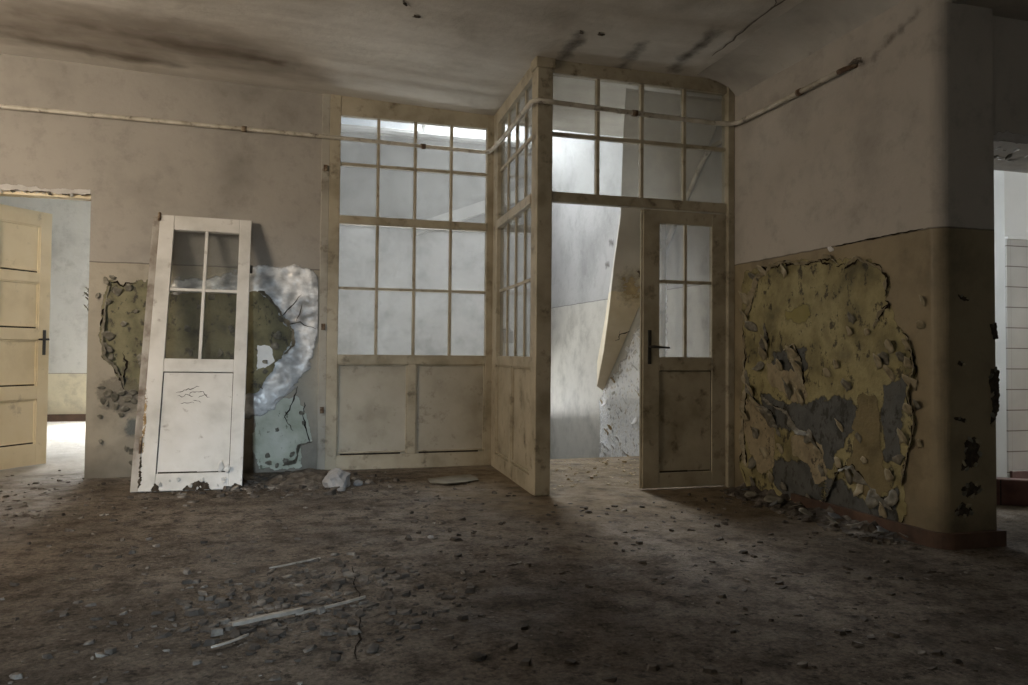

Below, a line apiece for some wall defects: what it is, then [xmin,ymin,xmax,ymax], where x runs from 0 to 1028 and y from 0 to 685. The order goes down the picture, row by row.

peeling [84,275,148,419]
peeling [252,396,312,470]
peeling [599,329,640,457]
peeling [738,246,926,523]
flaking render [955,436,983,518]
flaking render [989,367,1000,427]